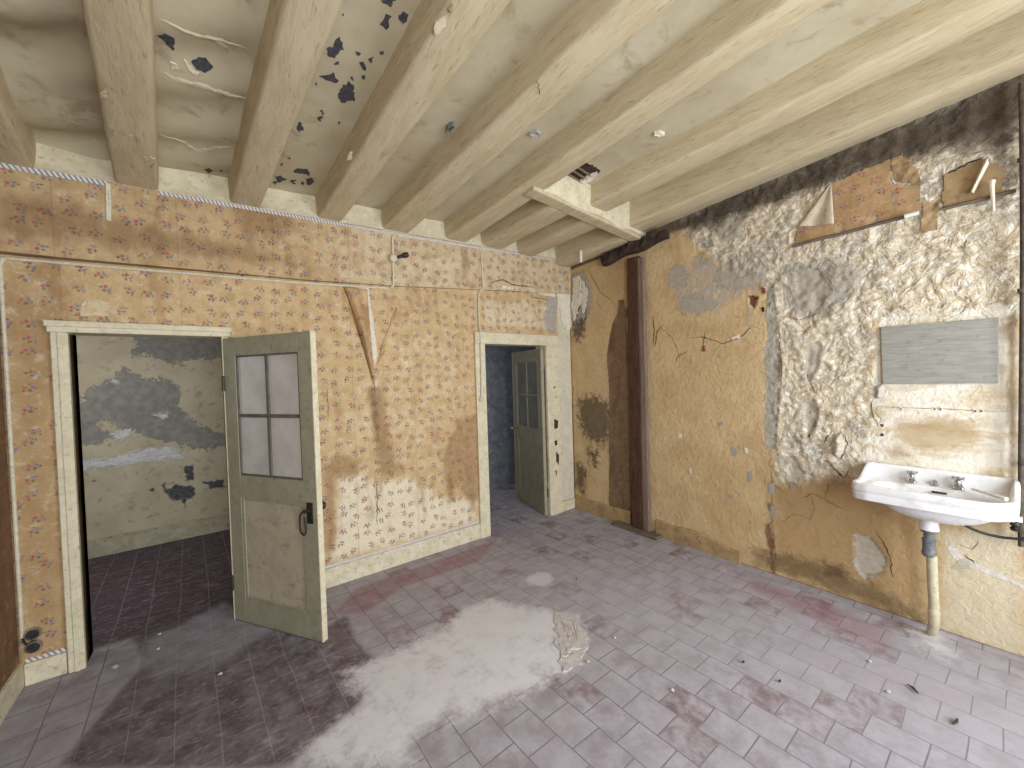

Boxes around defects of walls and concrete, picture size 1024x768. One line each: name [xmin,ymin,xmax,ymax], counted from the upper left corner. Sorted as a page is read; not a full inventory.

peeling [380,0,409,30]
spalling [433,3,453,36]
peeling [157,34,213,75]
peeling [315,37,384,103]
peeling [273,157,314,185]
peeling [343,287,397,390]
crack [653,318,759,361]
peeling [80,337,225,504]
leakage [574,395,610,497]
flaking render [802,342,824,439]
crack [785,461,849,521]
flaking render [852,531,893,580]